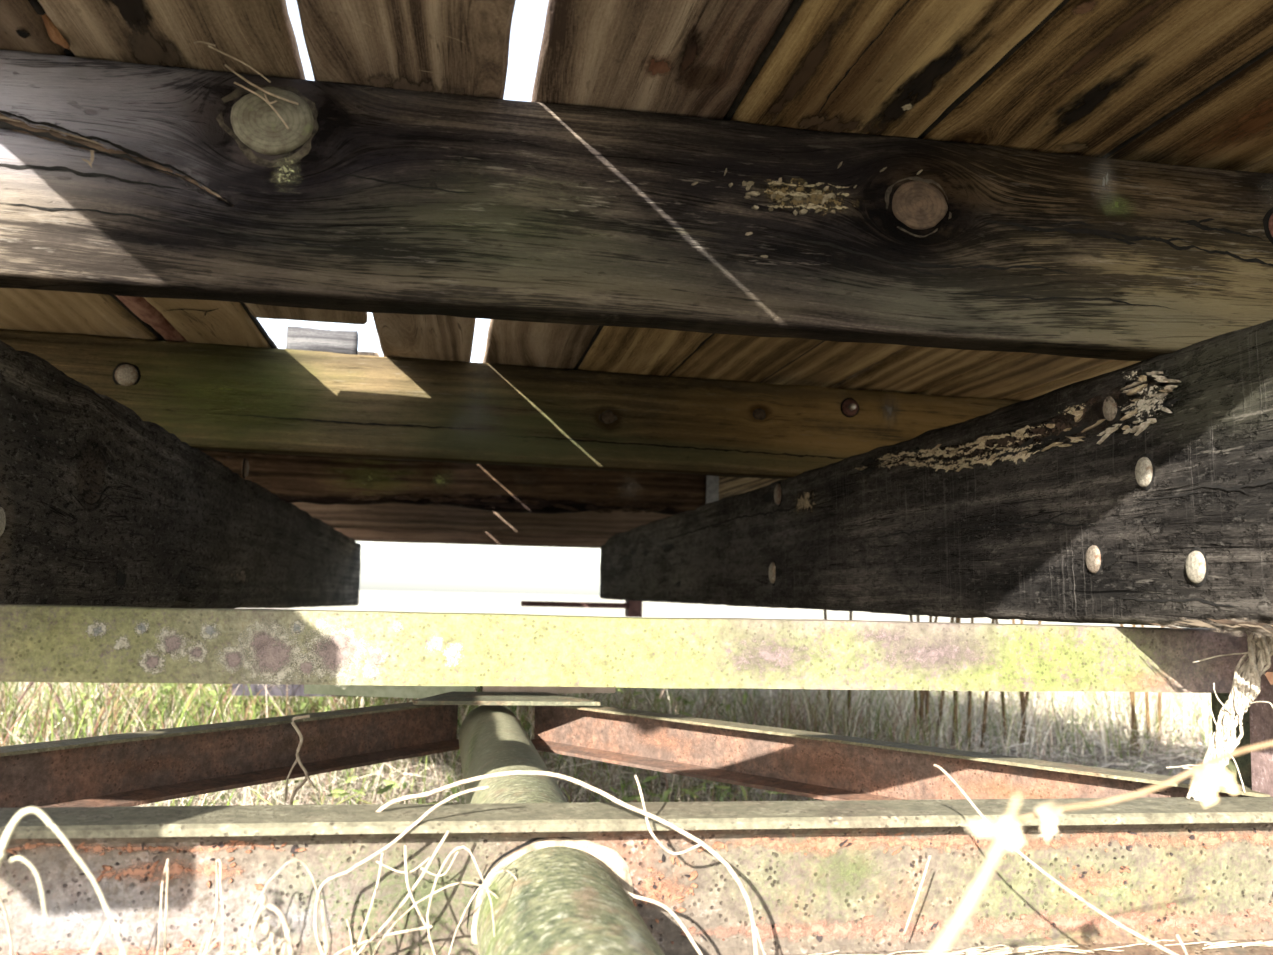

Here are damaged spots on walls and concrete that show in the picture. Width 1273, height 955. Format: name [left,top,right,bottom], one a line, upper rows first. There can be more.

peeling [724,168,858,216]
peeling [855,371,1182,472]
corrosion [633,843,698,913]
corrosion [698,831,994,867]
corrosion [961,828,1273,940]
corrosion [671,915,947,945]